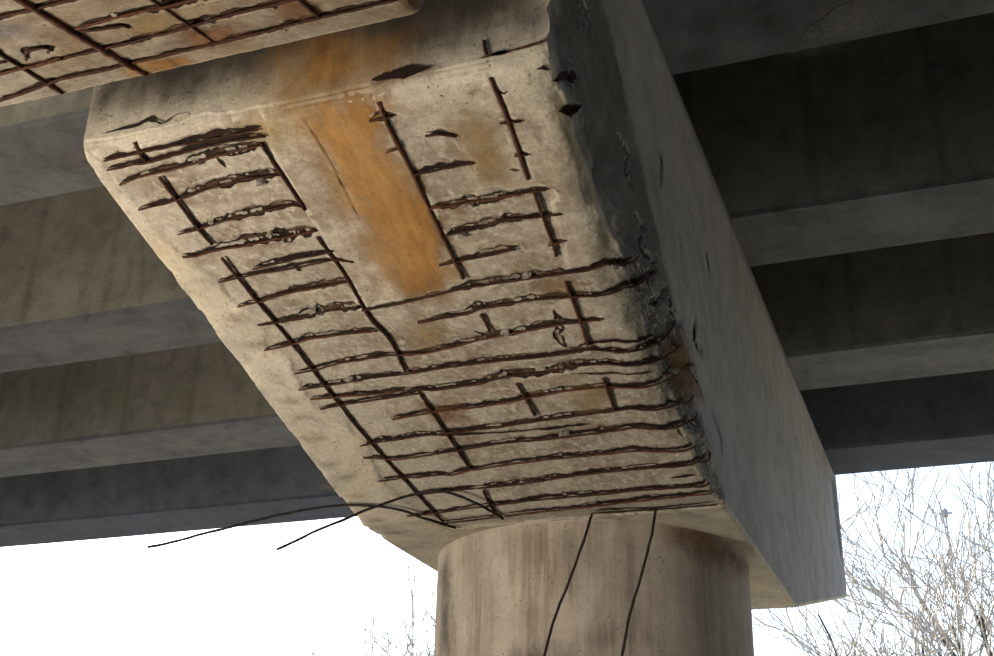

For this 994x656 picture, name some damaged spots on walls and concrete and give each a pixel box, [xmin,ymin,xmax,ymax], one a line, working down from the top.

spalling [0,0,398,102]
rust [306,88,451,297]
spalling [103,0,724,656]